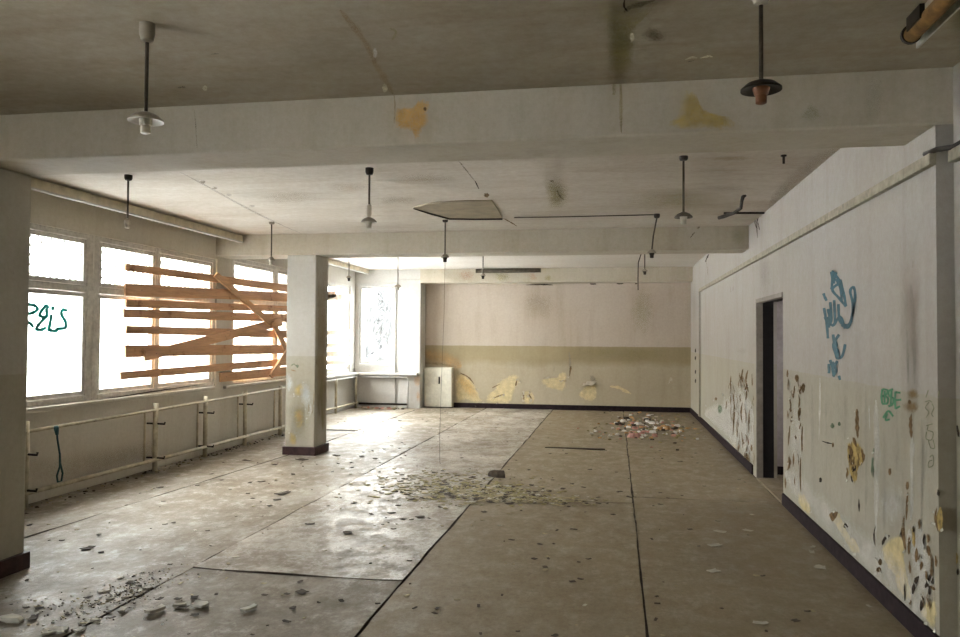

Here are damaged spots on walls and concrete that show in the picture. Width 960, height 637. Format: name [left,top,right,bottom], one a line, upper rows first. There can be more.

flaking render [455,373,535,404]
flaking render [705,369,755,462]
peeling [784,370,812,515]
flaking render [846,409,874,483]
peeling [829,510,860,556]
peeling [873,482,943,633]